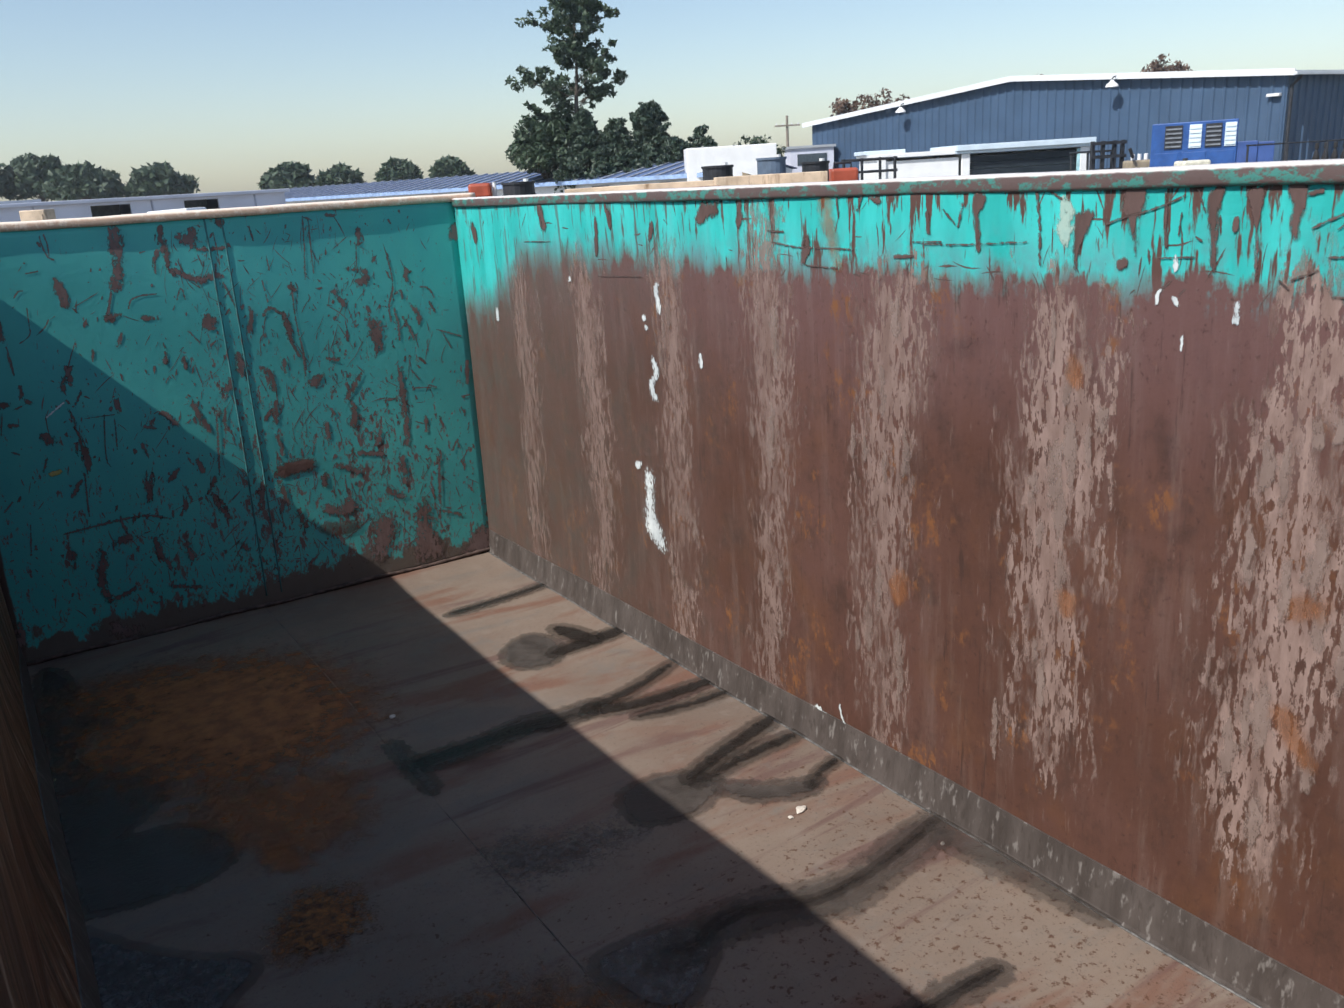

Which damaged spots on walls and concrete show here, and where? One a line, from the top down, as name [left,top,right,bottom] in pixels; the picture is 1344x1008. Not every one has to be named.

peeling [1056,195,1075,248]
corrosion [801,234,811,265]
spalling [275,457,316,478]
spalling [320,519,360,535]
damp [505,626,623,668]
damp [623,715,838,823]
damp [658,812,1109,968]